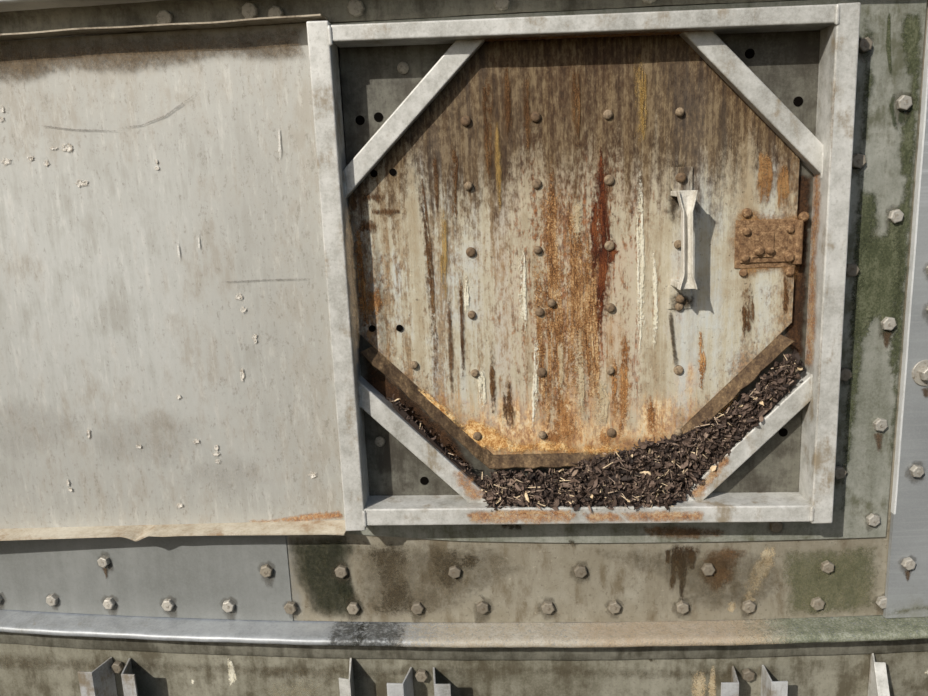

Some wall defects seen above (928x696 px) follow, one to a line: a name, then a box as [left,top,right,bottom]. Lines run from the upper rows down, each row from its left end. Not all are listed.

water stain [889,98,912,128]
rust [419,158,439,380]
rust [532,150,619,444]
rust [744,153,820,364]
rust [447,282,465,392]
rust [489,351,515,425]
water stain [340,578,353,600]
water stain [371,545,413,611]
water stain [435,552,476,585]
water stain [411,602,779,648]
rust [586,511,740,597]
water stain [227,661,236,685]